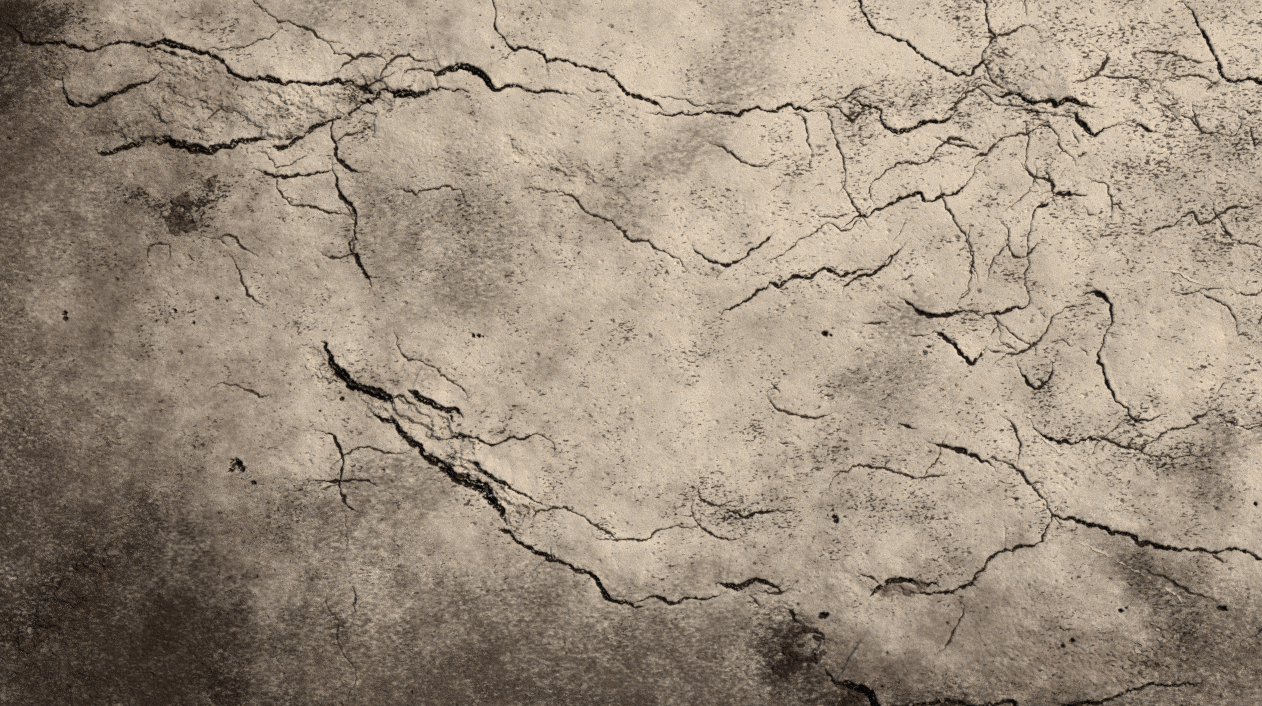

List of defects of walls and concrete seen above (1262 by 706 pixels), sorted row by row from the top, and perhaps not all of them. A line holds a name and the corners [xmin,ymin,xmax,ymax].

spalling [90,47,395,151]
crack [0,0,1262,465]
spalling [305,350,532,533]
crack [313,330,800,624]
crack [829,417,1262,602]
crack [766,665,1022,706]
crack [935,608,964,655]
crack [1061,680,1205,706]